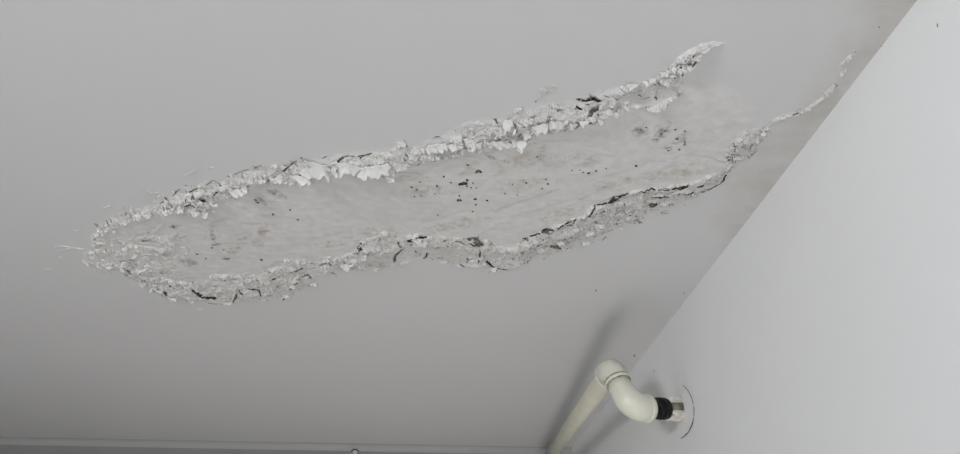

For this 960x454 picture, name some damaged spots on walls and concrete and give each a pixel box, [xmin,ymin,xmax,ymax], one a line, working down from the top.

peeling [82,41,726,306]
peeling [513,126,771,264]